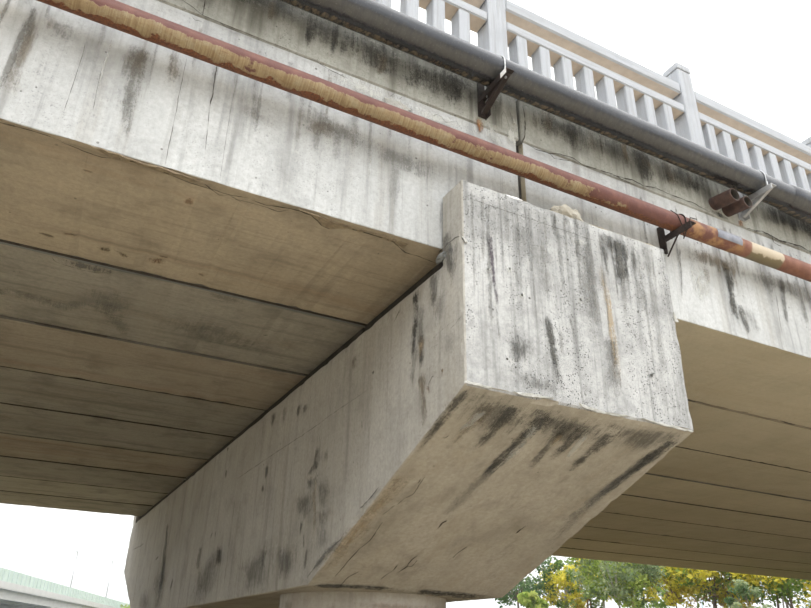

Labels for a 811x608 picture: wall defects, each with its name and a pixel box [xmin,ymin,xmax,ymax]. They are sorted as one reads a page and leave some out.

peeling [335,76,459,128]
crack [520,105,706,210]
spalling [0,120,432,262]
damp [483,237,498,302]
damp [603,237,628,285]
damp [699,254,749,332]
crack [747,228,811,252]
damp [412,293,423,367]
damp [545,319,560,381]
damp [421,391,467,446]
damp [483,413,613,476]
damp [588,440,676,506]